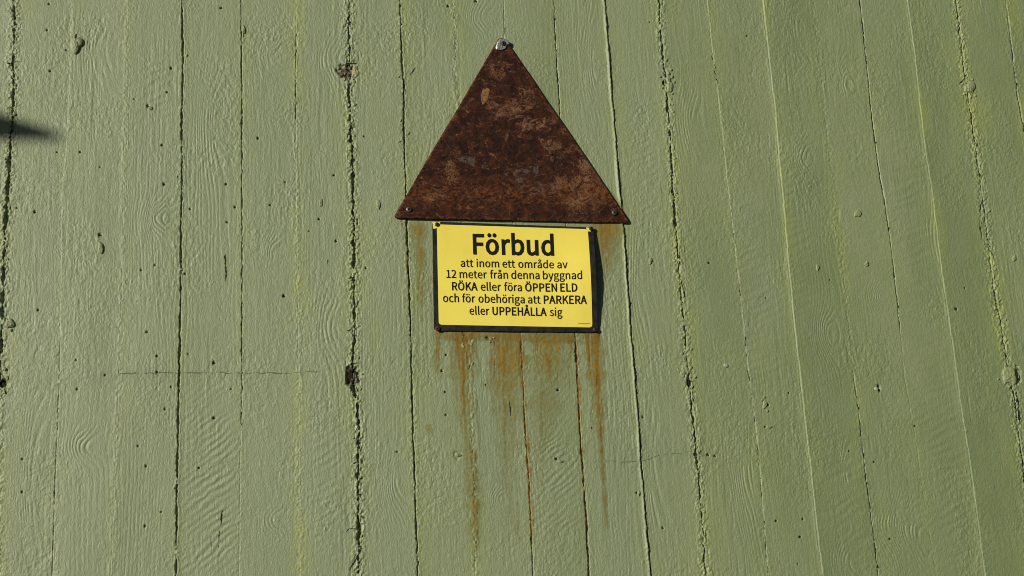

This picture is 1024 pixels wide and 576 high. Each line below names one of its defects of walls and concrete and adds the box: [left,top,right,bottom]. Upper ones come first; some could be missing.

rust [592,223,622,263]
rust [435,331,603,454]